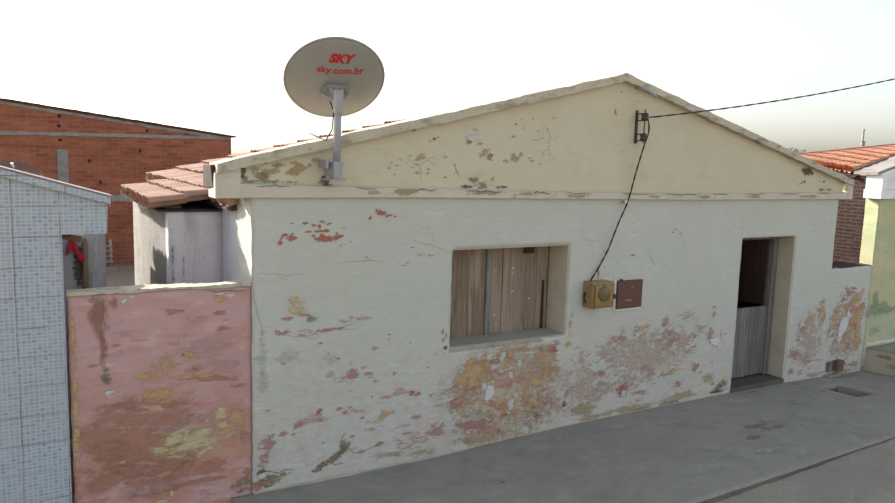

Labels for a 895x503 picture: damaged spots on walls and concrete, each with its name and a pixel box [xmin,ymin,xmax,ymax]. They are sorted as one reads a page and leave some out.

spalling [467,129,522,162]
peeling [278,220,352,246]
peeling [275,297,371,344]
peeling [787,287,866,375]
peeling [150,384,242,466]
spalling [229,409,324,493]
peeling [312,312,728,473]